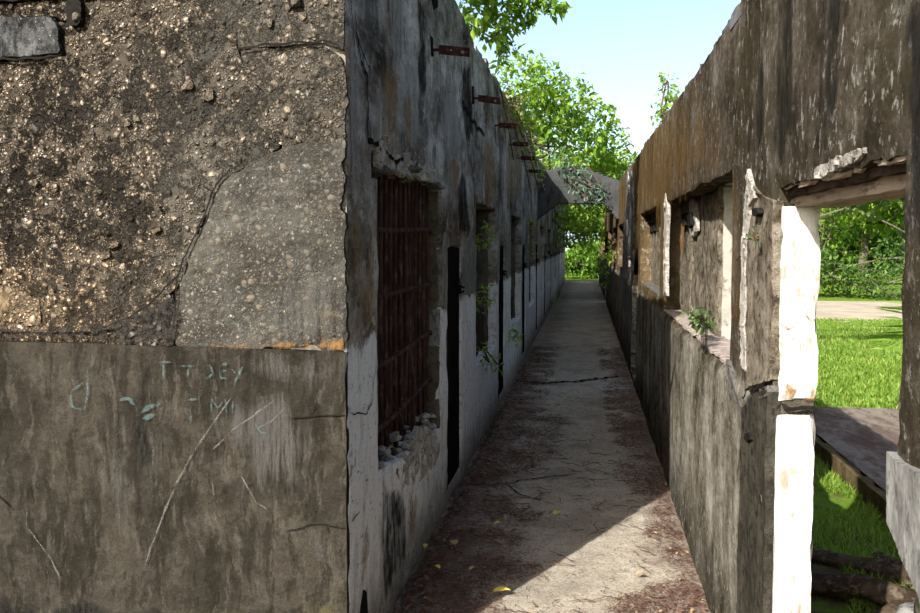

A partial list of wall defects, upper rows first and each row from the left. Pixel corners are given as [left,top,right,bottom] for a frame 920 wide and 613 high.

damp [774,0,793,162]
damp [818,0,839,133]
spalling [368,135,446,190]
damp [900,0,920,251]
crack [741,374,766,399]
crack [780,402,818,411]
spalling [378,412,440,486]